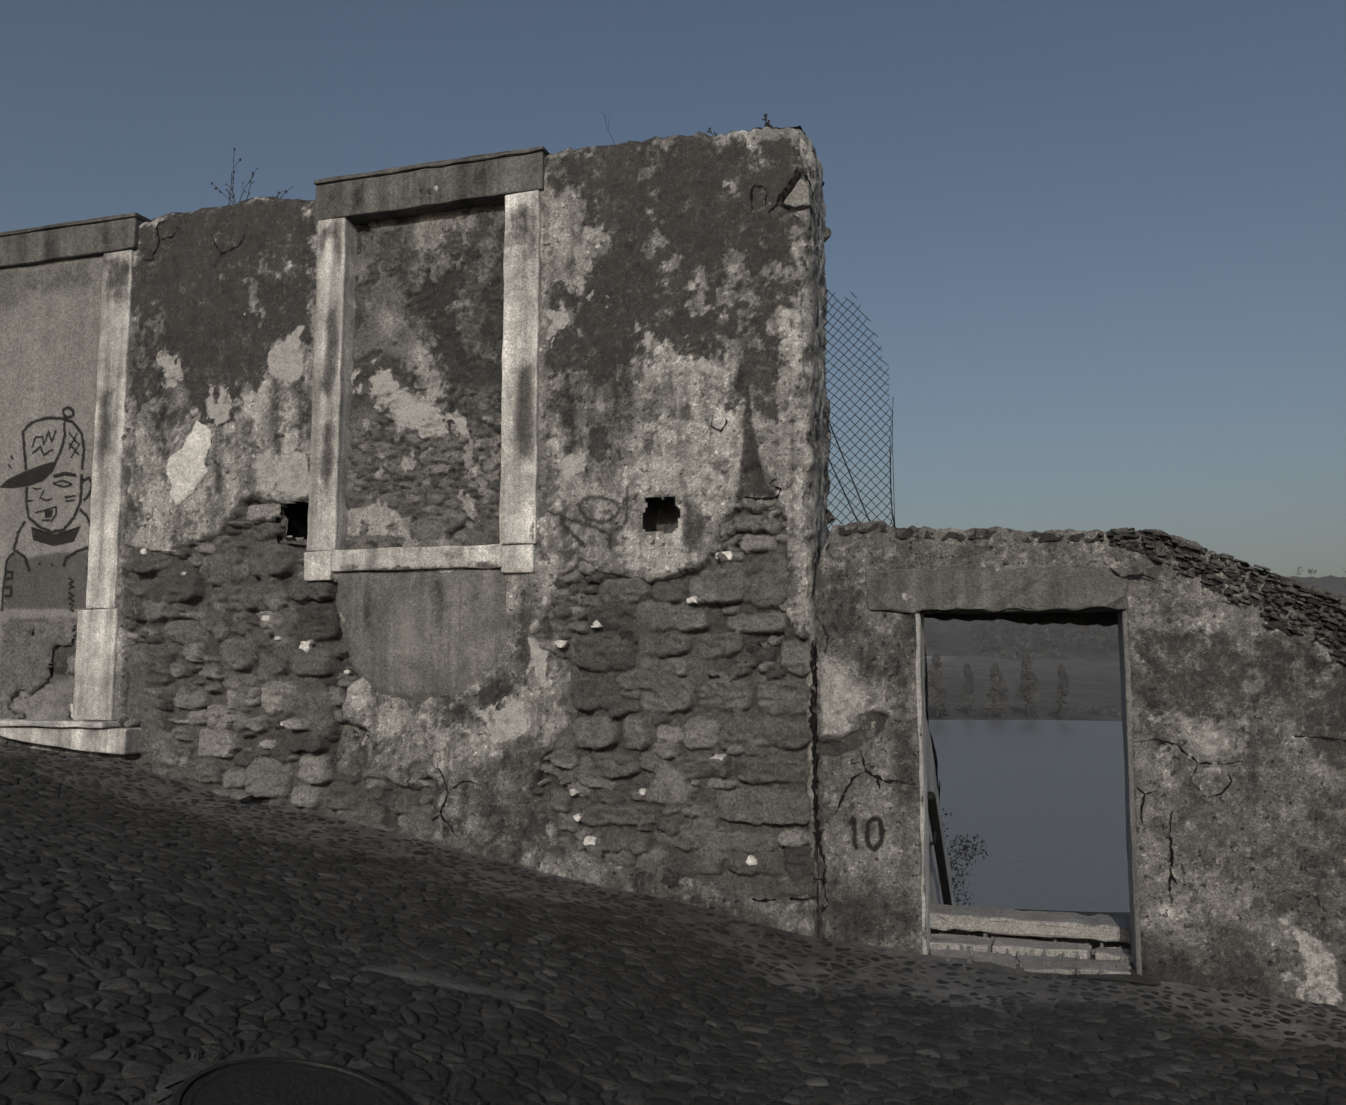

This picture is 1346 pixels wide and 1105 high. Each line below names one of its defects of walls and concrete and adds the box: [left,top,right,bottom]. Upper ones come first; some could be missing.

peeling [166,421,211,506]
damp [104,199,338,501]
damp [541,131,812,497]
peeling [0,622,77,719]
spalling [123,497,434,837]
spalling [531,496,888,901]
crack [751,614,917,913]
crack [1136,786,1177,905]
crack [1136,738,1244,798]